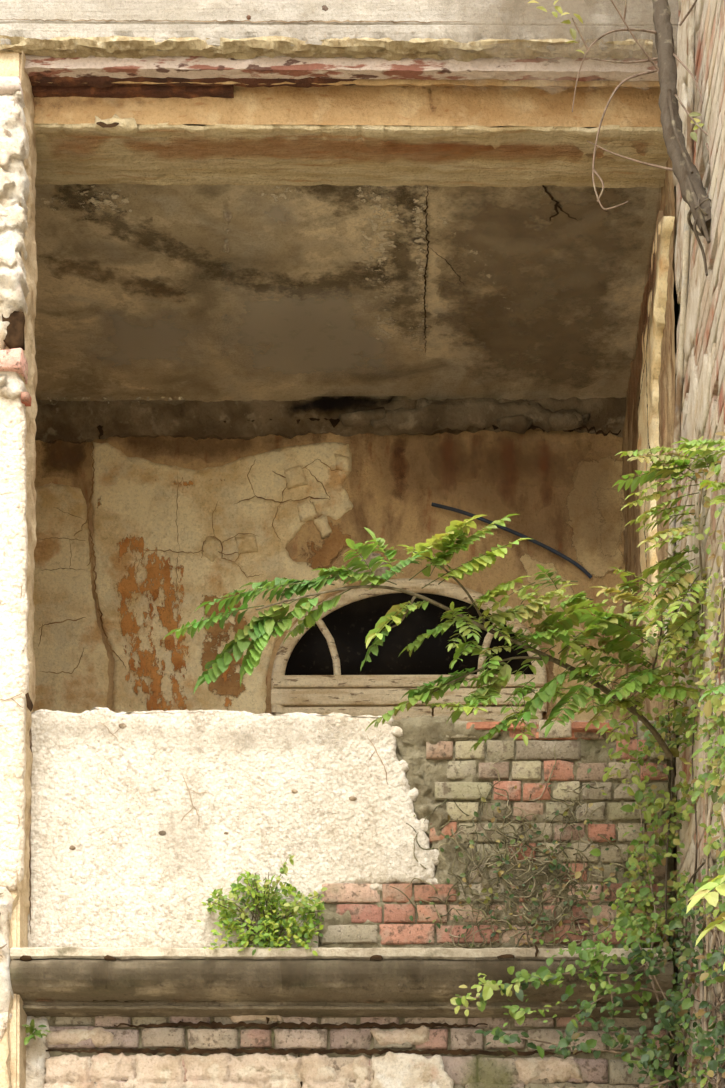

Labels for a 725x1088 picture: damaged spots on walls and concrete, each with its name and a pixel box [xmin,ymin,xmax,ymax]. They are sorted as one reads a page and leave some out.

flaking render [0,76,186,406]
water stain [40,184,510,361]
crack [423,186,465,352]
crack [542,185,578,221]
crack [224,418,340,427]
crack [528,425,621,436]
crack [38,425,126,674]
peeling [114,536,189,711]
flaking render [200,592,252,709]
crack [132,459,342,629]
flaking render [317,646,671,961]